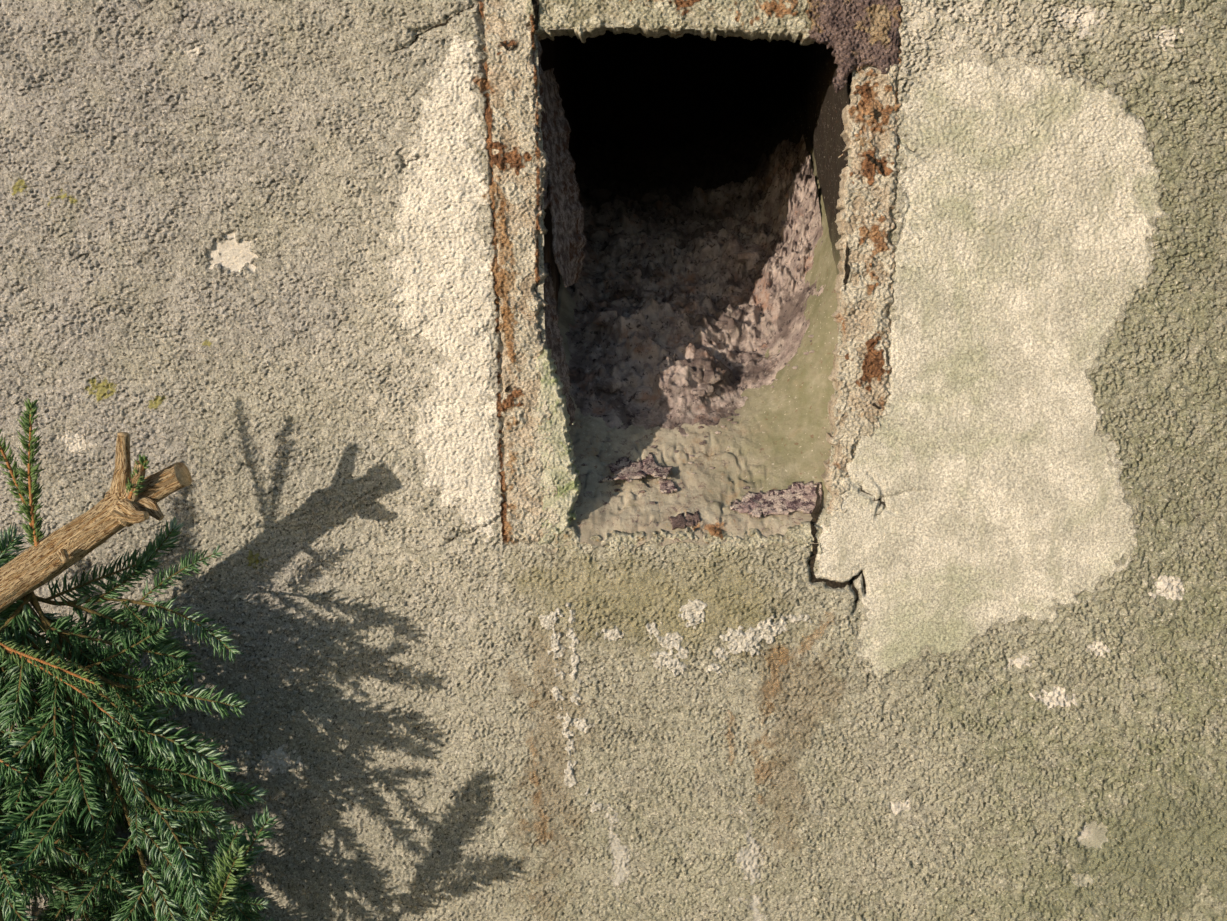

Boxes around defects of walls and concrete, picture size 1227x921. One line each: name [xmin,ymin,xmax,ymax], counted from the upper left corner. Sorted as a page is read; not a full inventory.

crack [392,3,474,53]
corrosion [849,69,900,189]
spalling [207,231,258,276]
corrosion [473,14,541,544]
peeling [483,0,822,561]
peeling [827,64,902,513]
corrosion [859,214,889,295]
corrosion [845,331,892,391]
crack [808,484,866,612]
leakage [645,599,708,677]
leakage [705,613,813,674]
leakage [538,602,629,886]